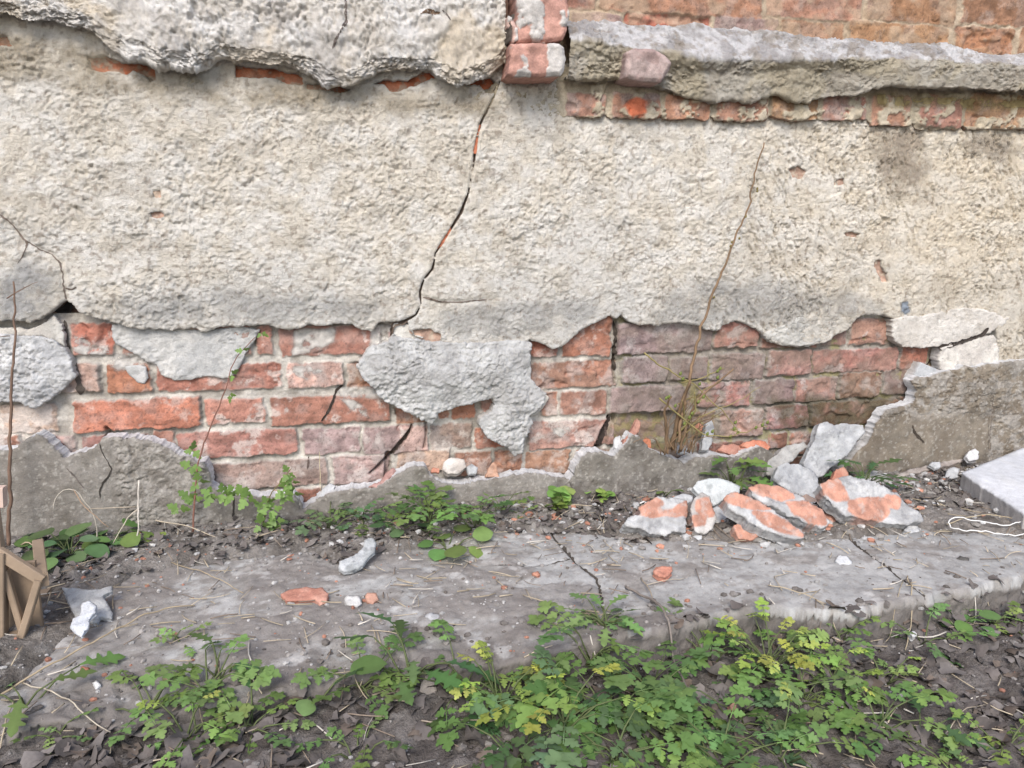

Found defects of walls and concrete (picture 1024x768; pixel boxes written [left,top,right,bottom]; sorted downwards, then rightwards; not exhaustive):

spalling [89,57,156,81]
spalling [235,66,348,93]
crack [390,82,500,337]
crack [0,215,85,395]
crack [938,328,989,350]
spalling [0,307,1009,502]
crack [389,424,412,454]
crack [67,445,112,497]